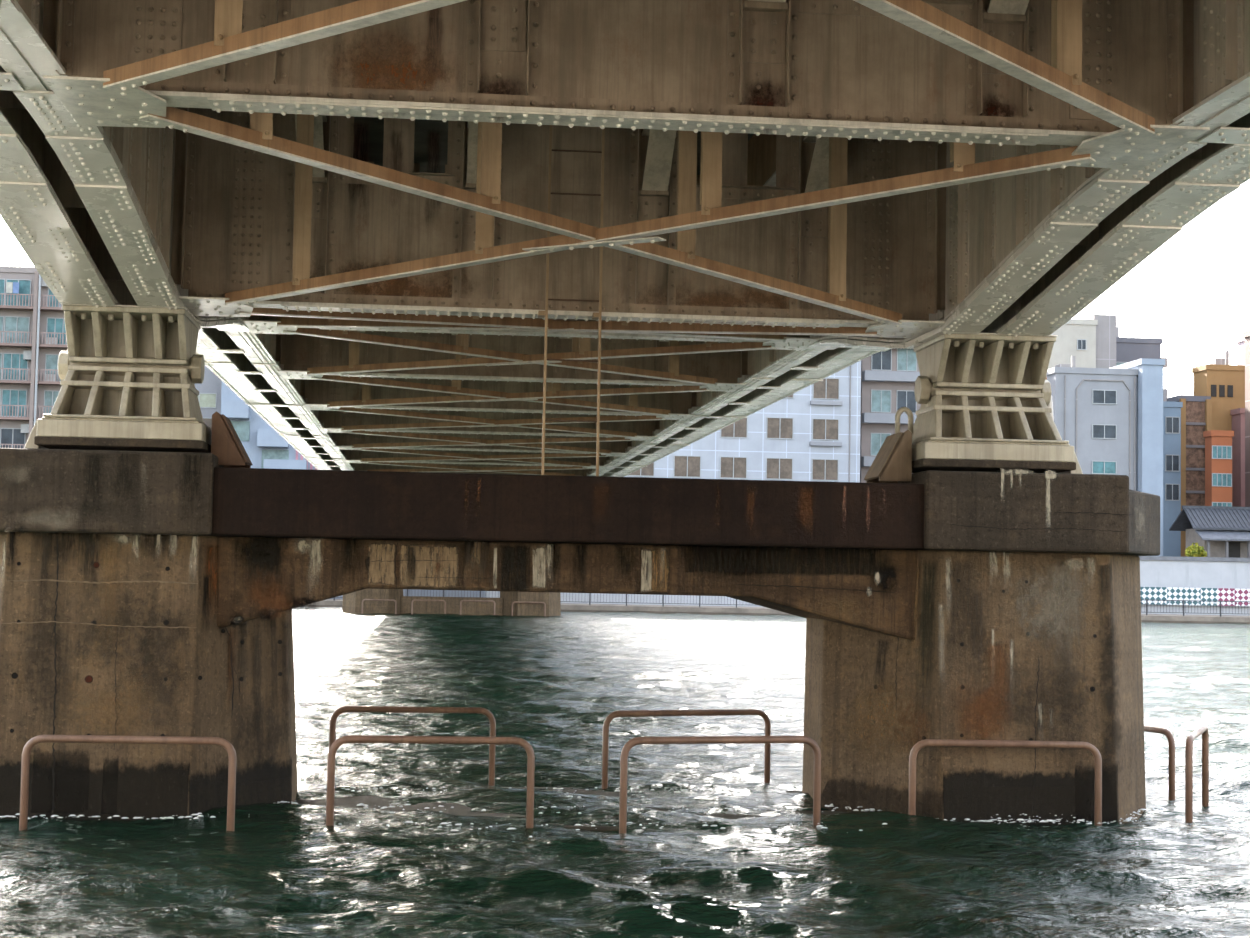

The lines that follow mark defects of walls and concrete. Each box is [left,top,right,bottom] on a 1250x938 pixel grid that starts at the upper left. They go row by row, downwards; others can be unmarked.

rust [429,8,440,40]
rust [337,35,443,91]
rust [746,82,784,107]
efflorescence [1001,469,1028,491]
efflorescence [1045,471,1056,521]
water stain [1,513,197,594]
water stain [298,540,321,569]
water stain [464,541,559,591]
water stain [618,547,669,592]
water stain [685,545,886,577]
water stain [943,558,1121,825]
water stain [0,753,292,821]